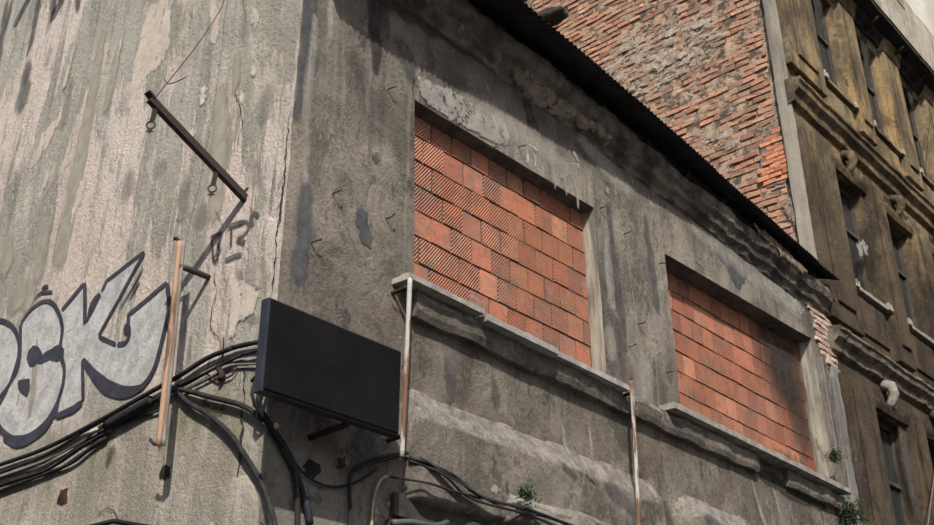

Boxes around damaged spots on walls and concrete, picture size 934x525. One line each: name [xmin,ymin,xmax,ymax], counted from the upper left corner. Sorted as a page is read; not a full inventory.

leakage [0,1,13,56]
leakage [17,0,60,111]
peeling [126,0,171,109]
peeling [209,0,220,44]
leakage [368,0,414,79]
leakage [291,0,317,284]
spalling [513,68,613,148]
crack [270,111,291,296]
crack [205,263,221,350]
peeling [227,276,259,337]
crack [236,369,246,478]